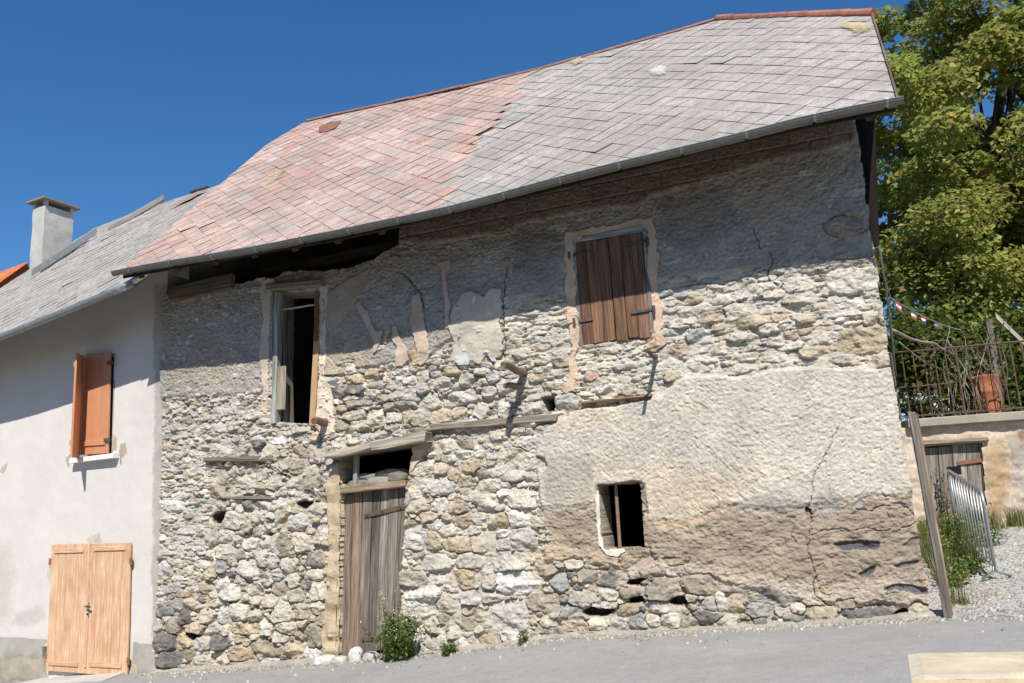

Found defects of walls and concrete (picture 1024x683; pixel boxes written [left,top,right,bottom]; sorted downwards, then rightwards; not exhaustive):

peeling [255,284,272,415]
peeling [314,267,430,438]
peeling [439,258,504,365]
crack [500,268,508,351]